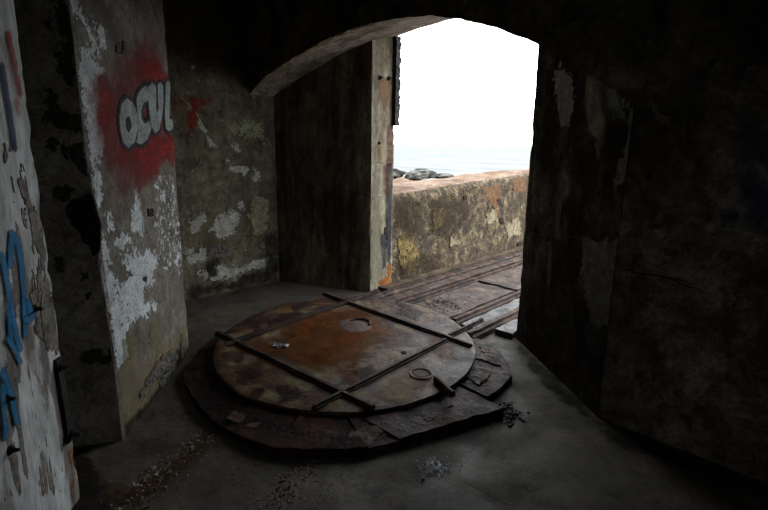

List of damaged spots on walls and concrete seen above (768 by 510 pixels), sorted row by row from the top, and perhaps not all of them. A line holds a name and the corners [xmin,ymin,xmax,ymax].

peeling [548,57,577,132]
peeling [40,0,272,370]
corrosion [378,125,393,195]
peeling [604,86,634,203]
corrosion [379,264,391,286]
peeling [3,348,30,501]
peeling [39,409,64,497]